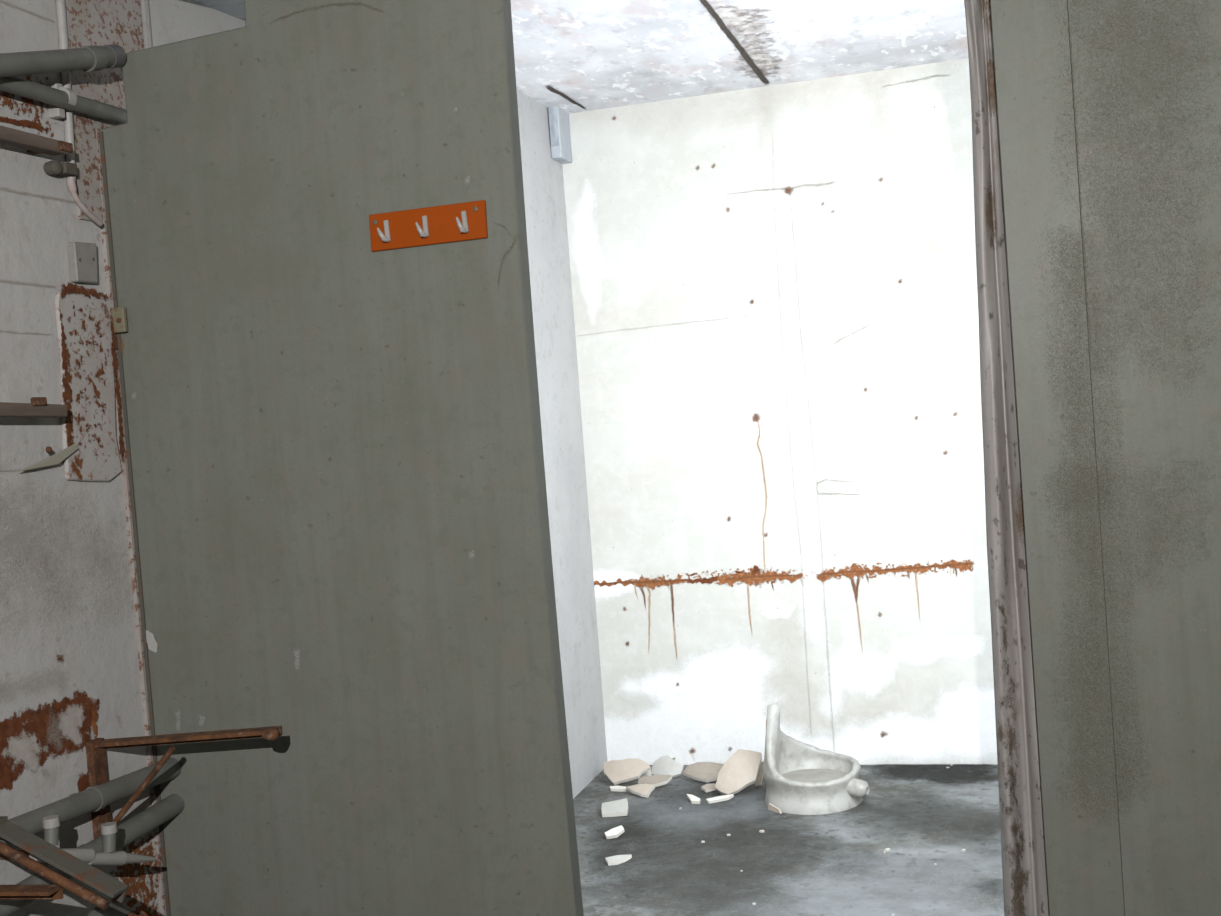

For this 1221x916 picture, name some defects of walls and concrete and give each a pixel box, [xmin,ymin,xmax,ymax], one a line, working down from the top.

rust [0,91,56,138]
flaking render [760,151,808,228]
rust [60,282,125,480]
flaking render [732,384,782,454]
rust [594,412,974,660]